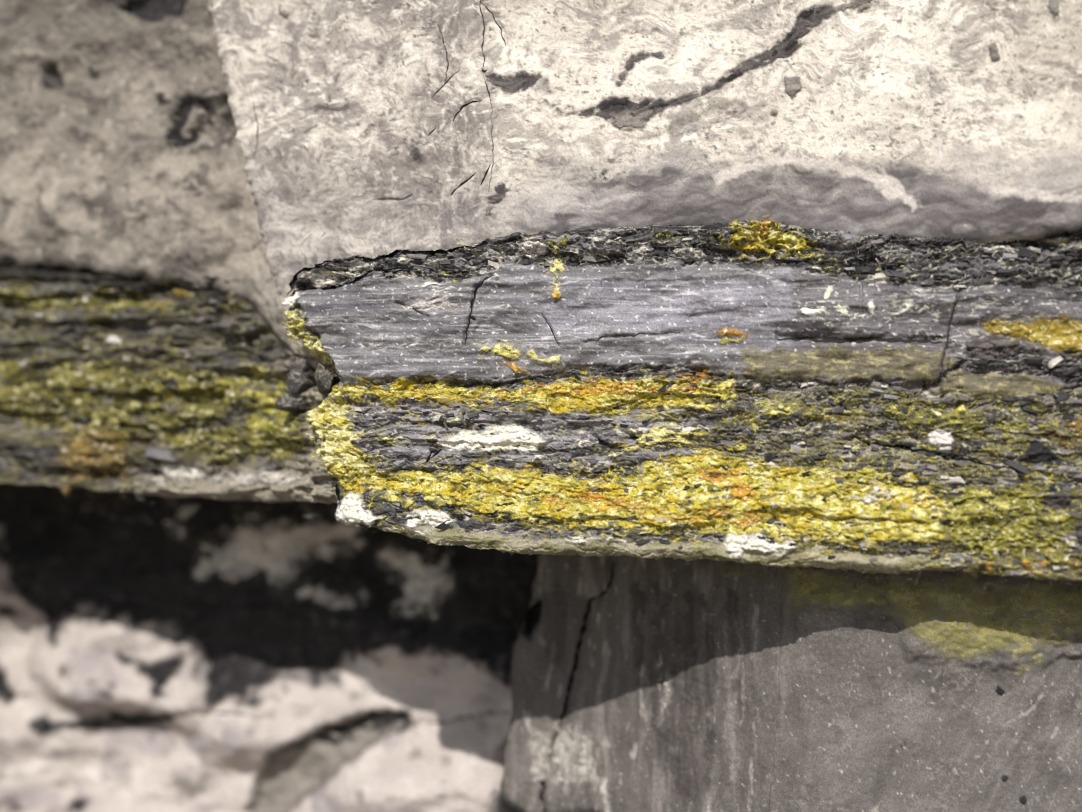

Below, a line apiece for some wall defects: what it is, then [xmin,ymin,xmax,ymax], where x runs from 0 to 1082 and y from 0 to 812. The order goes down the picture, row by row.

crack [428,0,506,195]
crack [540,562,614,812]